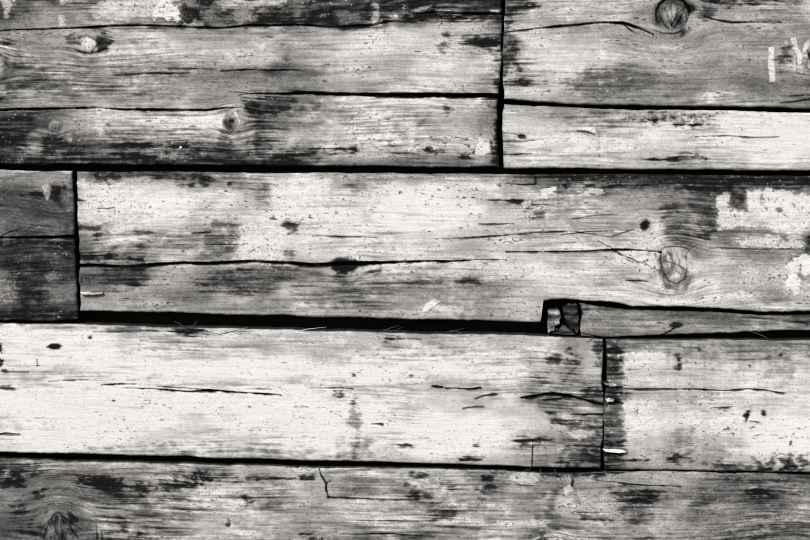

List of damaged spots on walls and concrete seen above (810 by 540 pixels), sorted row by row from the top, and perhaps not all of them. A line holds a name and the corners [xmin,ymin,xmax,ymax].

crack [0,23,174,32]
crack [516,0,692,38]
leakage [174,0,552,167]
leakage [340,173,385,200]
leakage [484,106,810,255]
crack [148,260,187,268]
leakage [185,216,307,302]
peeling [711,185,810,307]
leakage [373,332,488,380]
crack [47,379,282,396]
crack [520,392,605,417]
leakage [510,338,810,540]